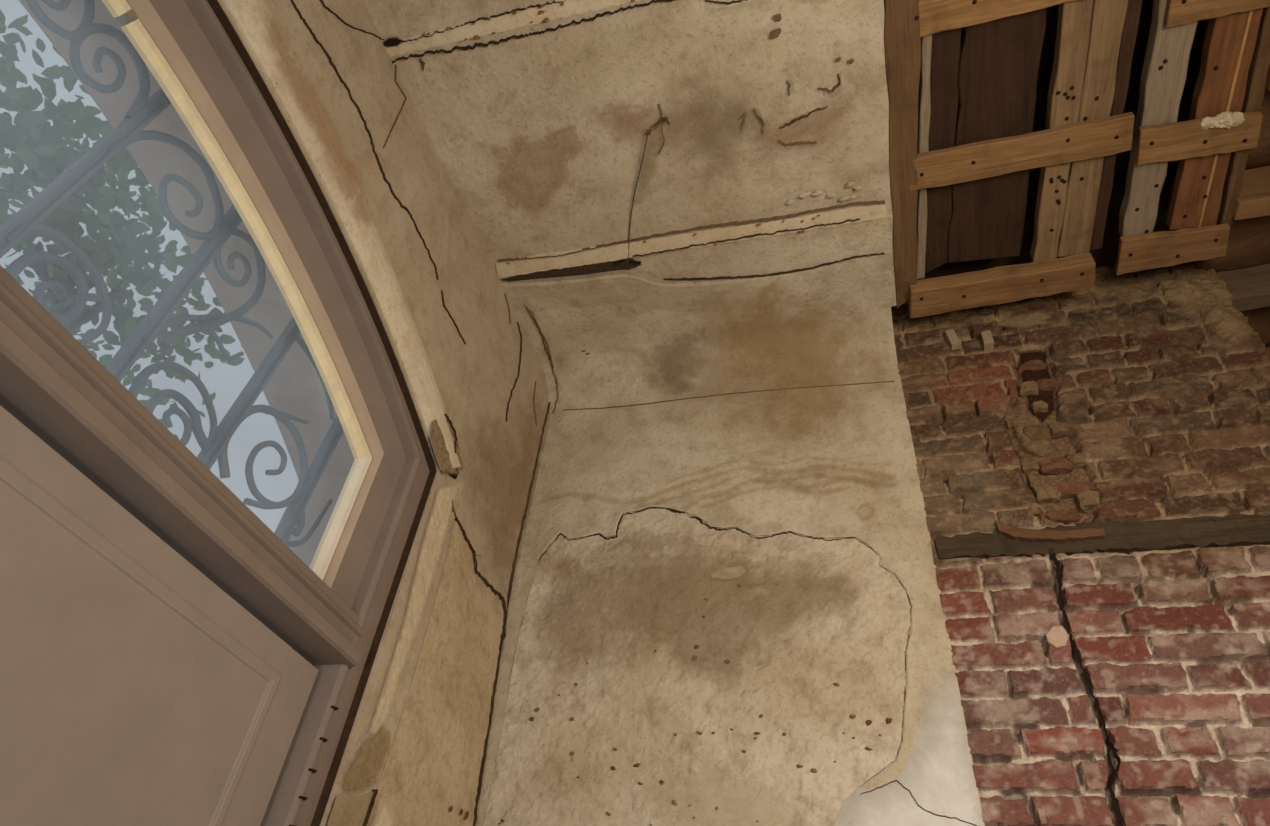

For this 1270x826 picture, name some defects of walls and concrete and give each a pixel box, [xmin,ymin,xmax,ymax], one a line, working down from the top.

crack [290,0,466,344]
peeling [704,0,782,40]
spalling [344,485,924,826]
crack [1050,548,1123,826]